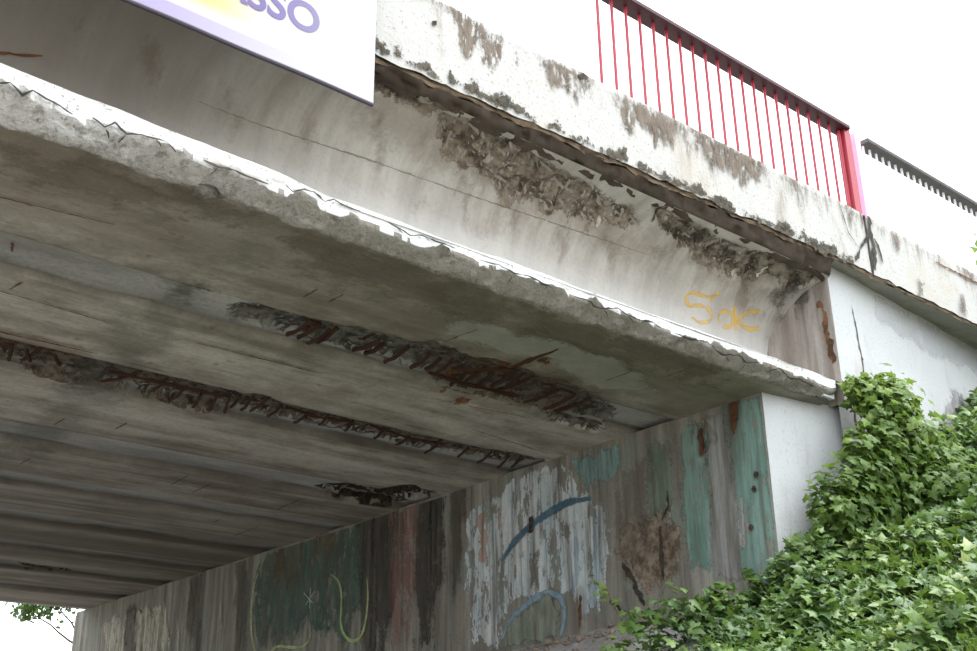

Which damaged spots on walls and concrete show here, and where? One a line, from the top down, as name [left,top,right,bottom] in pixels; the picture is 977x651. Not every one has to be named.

spalling [374,74,635,232]
peeling [616,97,678,150]
peeling [698,131,763,186]
spalling [648,207,818,295]
spalling [226,302,618,431]
peeling [0,337,712,651]
peeling [721,396,777,584]
damp [355,512,395,651]
damp [412,496,446,648]